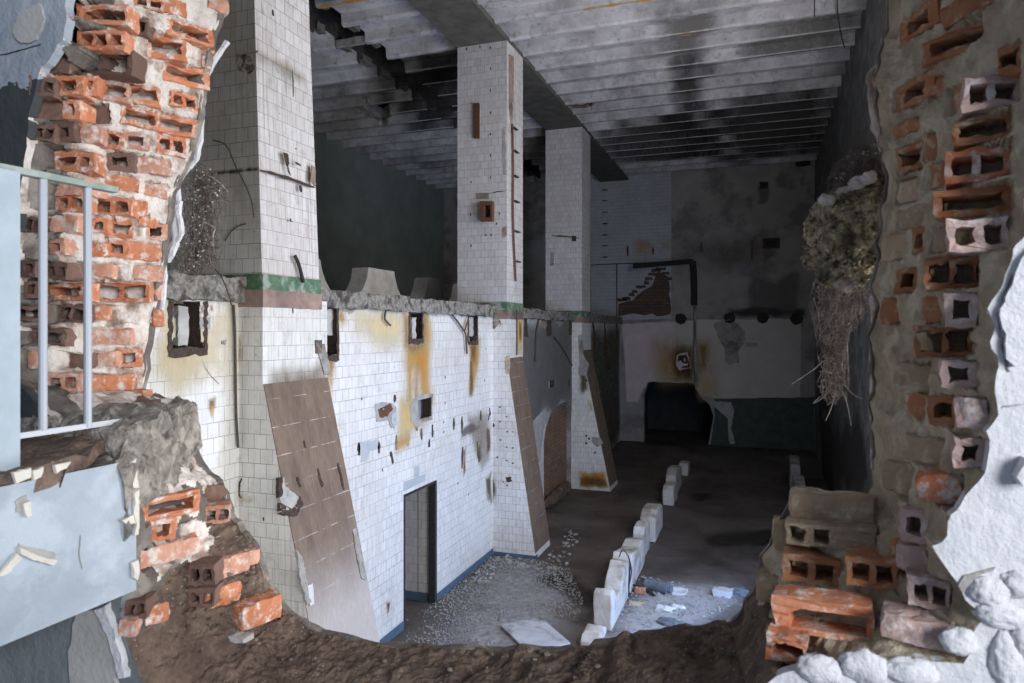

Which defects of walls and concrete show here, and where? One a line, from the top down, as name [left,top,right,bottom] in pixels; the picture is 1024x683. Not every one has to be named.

flaking render [13,3,46,44]
water stain [602,13,834,163]
spalling [20,0,257,424]
flaking render [617,267,672,316]
rust [399,316,431,447]
rust [466,330,479,395]
rust [660,347,694,380]
spalling [730,0,1024,683]
spalling [374,402,397,429]
rust [581,472,607,487]
spalling [68,453,288,683]